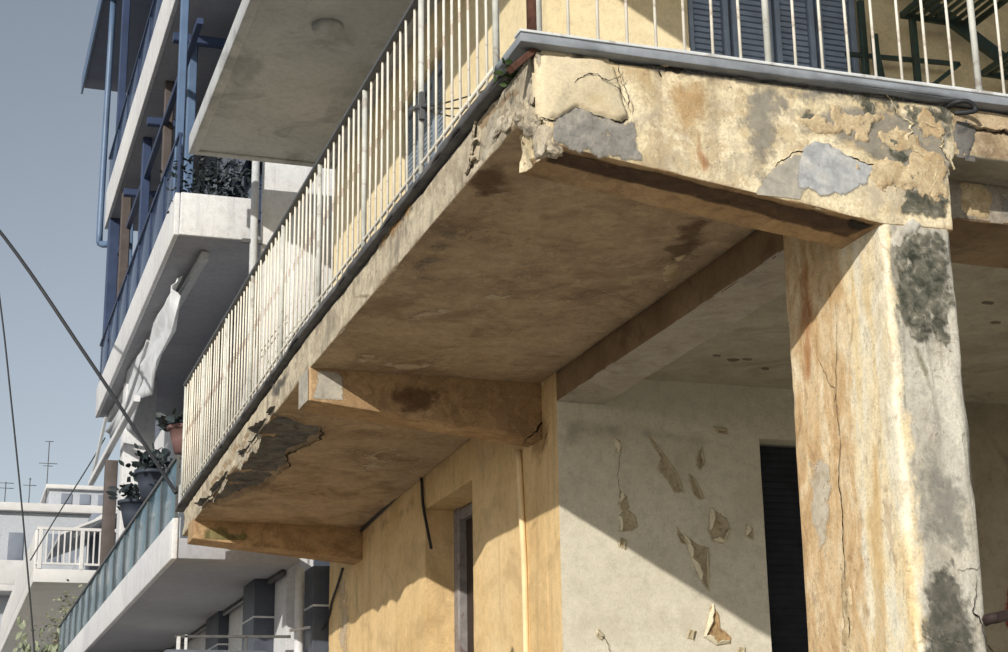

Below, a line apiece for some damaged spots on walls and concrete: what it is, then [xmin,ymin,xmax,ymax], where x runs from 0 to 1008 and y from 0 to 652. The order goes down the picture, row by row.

spalling [477,52,642,163]
peeling [756,101,976,207]
crack [887,95,955,184]
crack [970,123,1008,135]
mould [901,190,949,219]
peeling [960,182,993,219]
mould [895,231,956,368]
spalling [194,369,343,506]
leakage [393,388,435,412]
peeling [649,435,746,652]
leakage [921,470,968,548]
leakage [922,560,974,652]